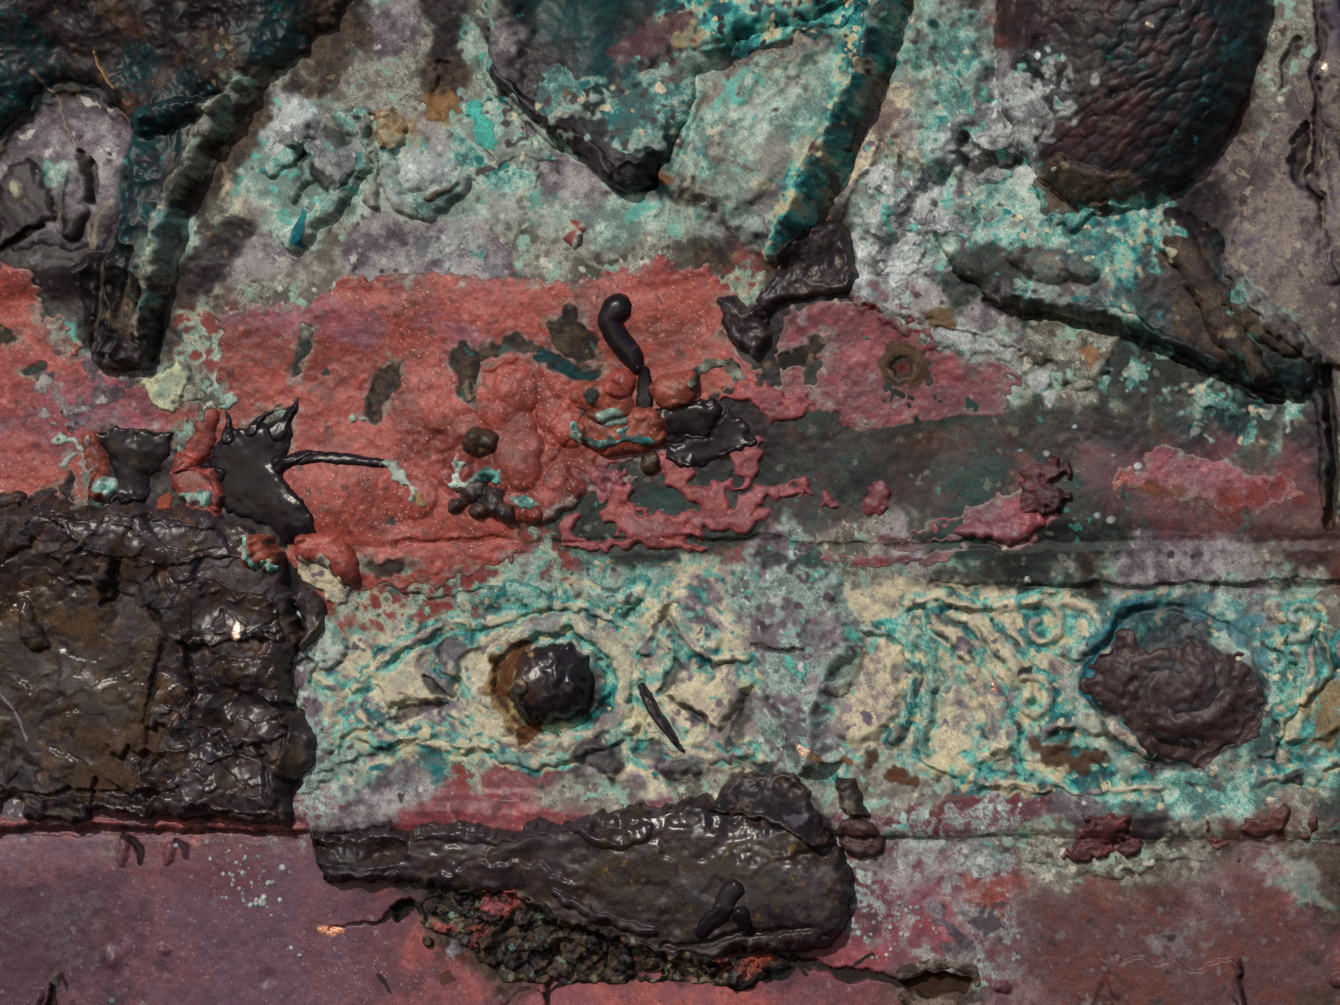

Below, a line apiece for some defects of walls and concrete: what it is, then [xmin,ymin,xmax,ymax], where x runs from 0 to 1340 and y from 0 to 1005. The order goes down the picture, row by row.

rust [879,341,927,387]
peeling [0,254,1023,591]
peeling [1111,444,1306,522]
peeling [994,513,1059,551]
rust [480,640,542,745]
crack [335,908,397,928]
crack [45,972,68,1005]
crack [1239,962,1247,1005]